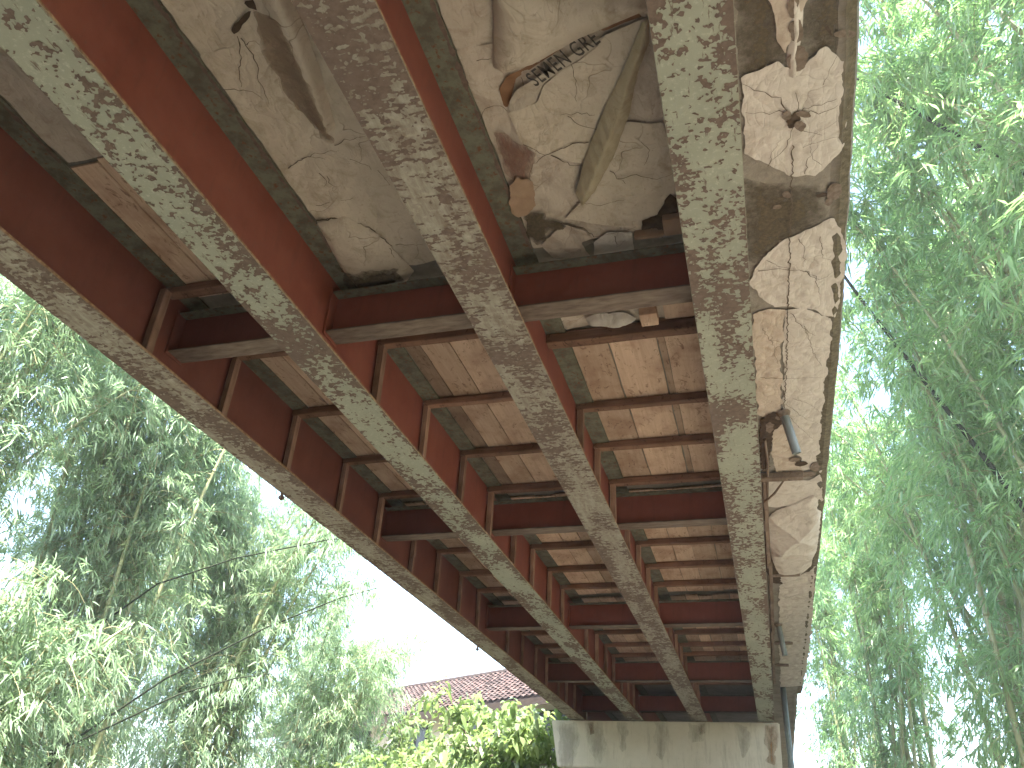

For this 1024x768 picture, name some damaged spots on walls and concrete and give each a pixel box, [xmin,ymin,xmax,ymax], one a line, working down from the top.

crack [224,36,269,104]
crack [523,65,594,186]
spalling [782,111,811,132]
spalling [787,0,808,71]
crack [288,136,421,256]
crack [563,142,667,246]
crack [743,55,841,439]
peeling [0,0,641,720]
peeling [292,0,704,716]
peeling [641,0,783,721]